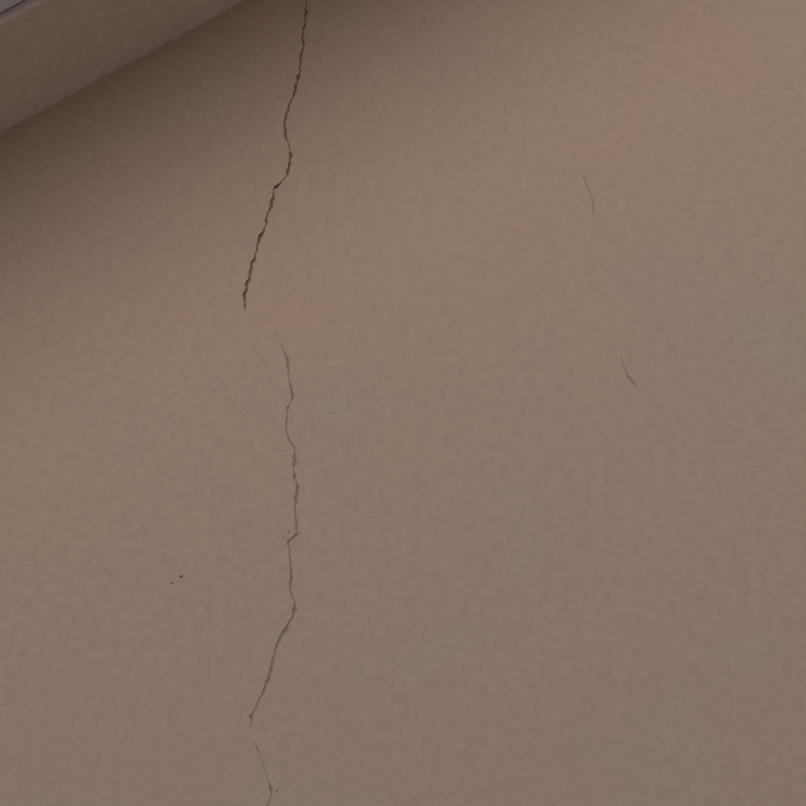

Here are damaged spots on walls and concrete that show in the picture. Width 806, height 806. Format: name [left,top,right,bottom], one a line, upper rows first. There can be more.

crack [242,0,308,311]
crack [249,329,301,806]